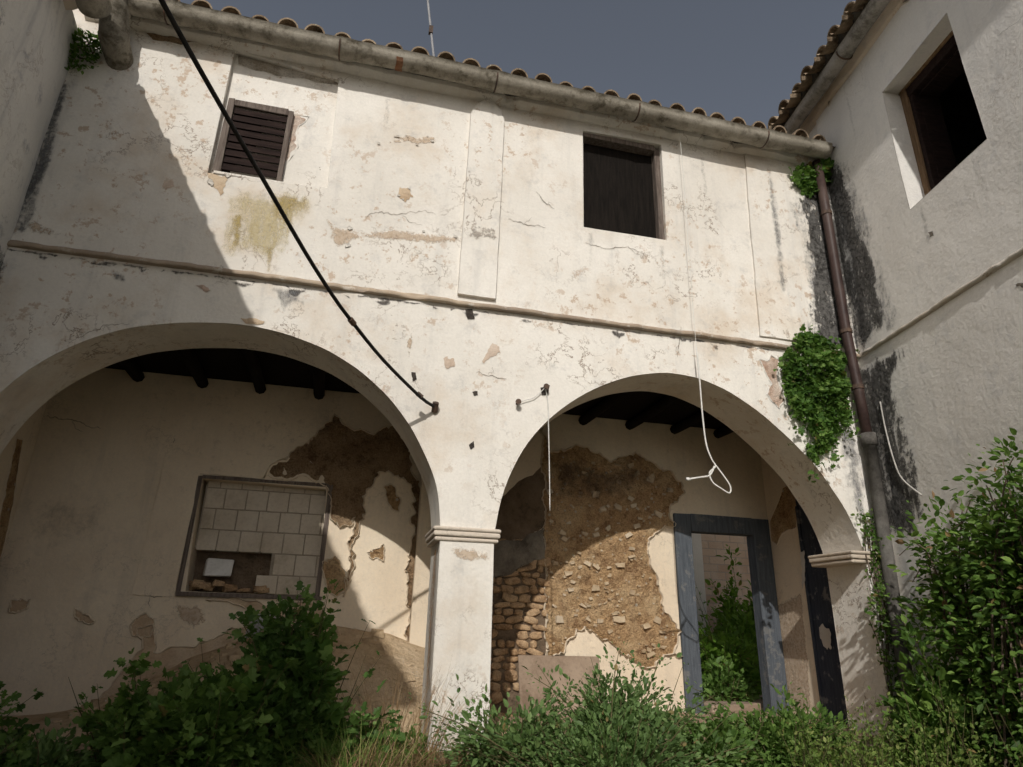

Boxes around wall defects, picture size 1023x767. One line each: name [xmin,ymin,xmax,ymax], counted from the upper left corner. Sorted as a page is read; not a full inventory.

water stain [17,84,66,233]
peeling [377,135,434,145]
water stain [229,197,304,253]
peeling [328,221,457,247]
water stain [796,157,889,348]
spalling [759,355,786,409]
water stain [860,350,923,535]
spalling [263,413,421,641]
spalling [99,612,250,698]
spalling [205,597,322,627]
spalling [490,428,686,717]